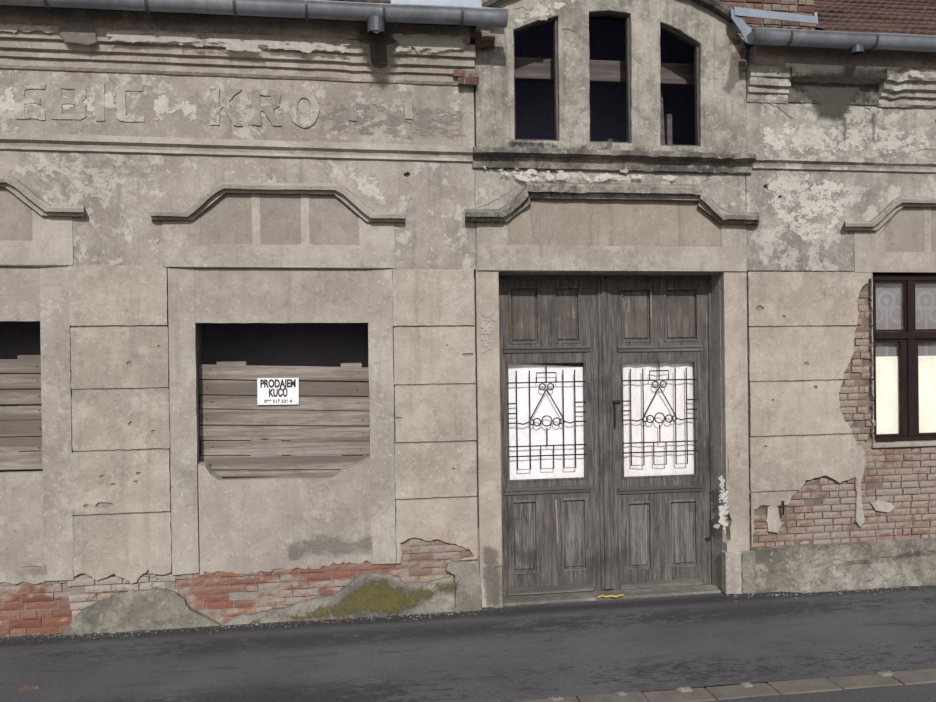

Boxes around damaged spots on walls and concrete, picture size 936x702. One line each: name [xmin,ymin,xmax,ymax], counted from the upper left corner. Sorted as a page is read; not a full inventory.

damp [359,29,396,80]
peeling [0,87,42,115]
peeling [62,88,116,114]
peeling [152,94,199,122]
damp [786,57,899,116]
peeling [759,121,932,157]
peeling [483,165,644,183]
peeling [759,170,852,241]
spalling [749,281,936,547]
spalling [0,528,479,637]